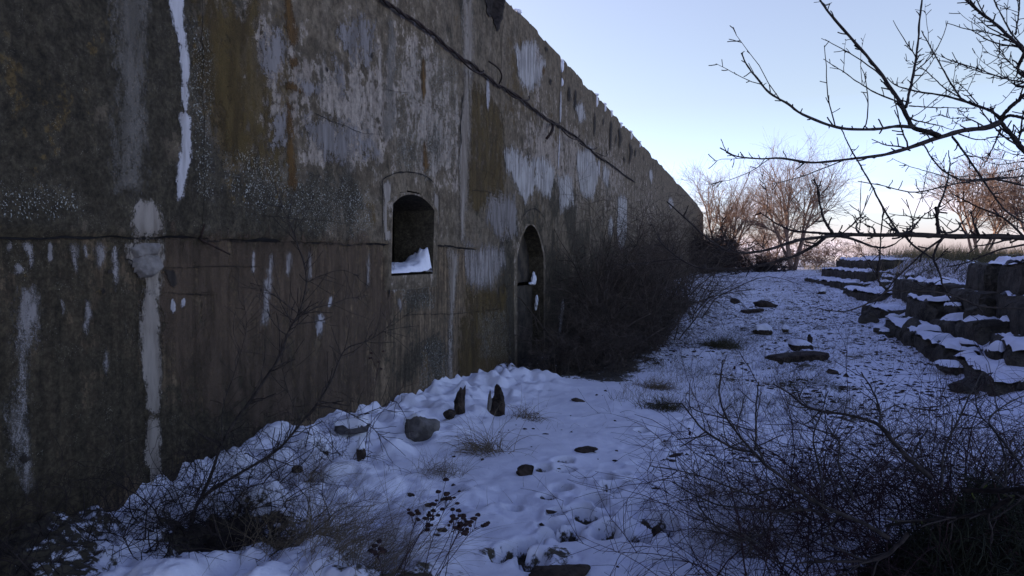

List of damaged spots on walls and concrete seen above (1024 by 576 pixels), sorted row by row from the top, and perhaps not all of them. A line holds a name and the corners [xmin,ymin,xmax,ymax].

leakage [169,0,288,200]
crack [0,0,464,295]
peeling [256,25,287,83]
peeling [267,102,381,166]
peeling [298,9,380,103]
peeling [514,39,552,93]
peeling [504,86,636,212]
efflorescence [10,288,40,492]
peeling [124,197,177,485]
leakage [153,221,402,431]